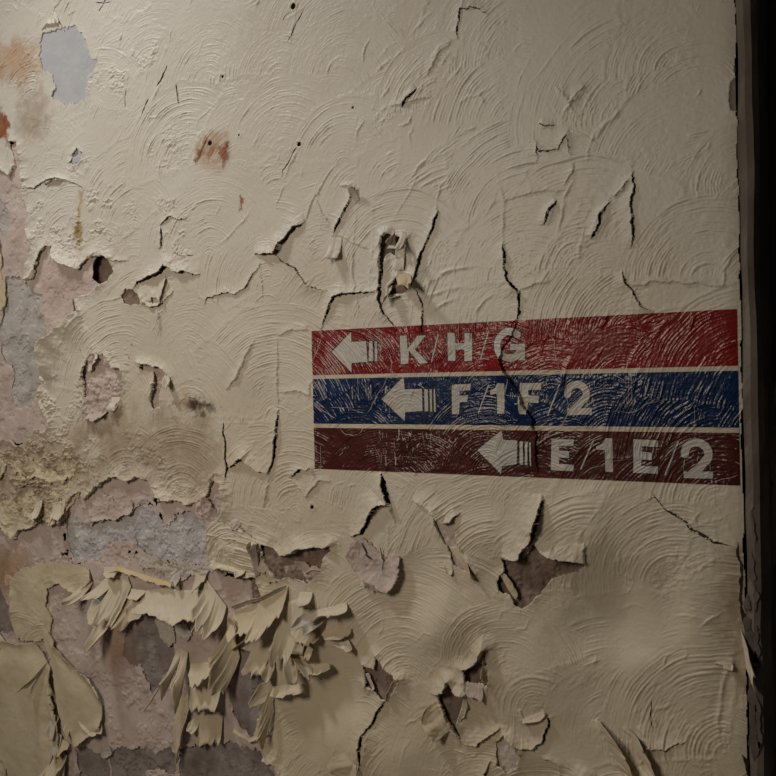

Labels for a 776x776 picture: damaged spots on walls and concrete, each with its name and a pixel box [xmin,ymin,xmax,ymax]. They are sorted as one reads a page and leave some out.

flaking render [39,0,98,107]
rust [0,113,10,139]
rust [194,135,228,166]
peeling [585,169,634,248]
peeling [492,242,549,320]
crack [315,344,427,436]
crack [543,321,569,440]
peeling [0,130,439,776]
flaking render [413,490,597,615]
crack [649,494,746,624]
peeling [717,508,763,760]
peeling [421,630,686,776]